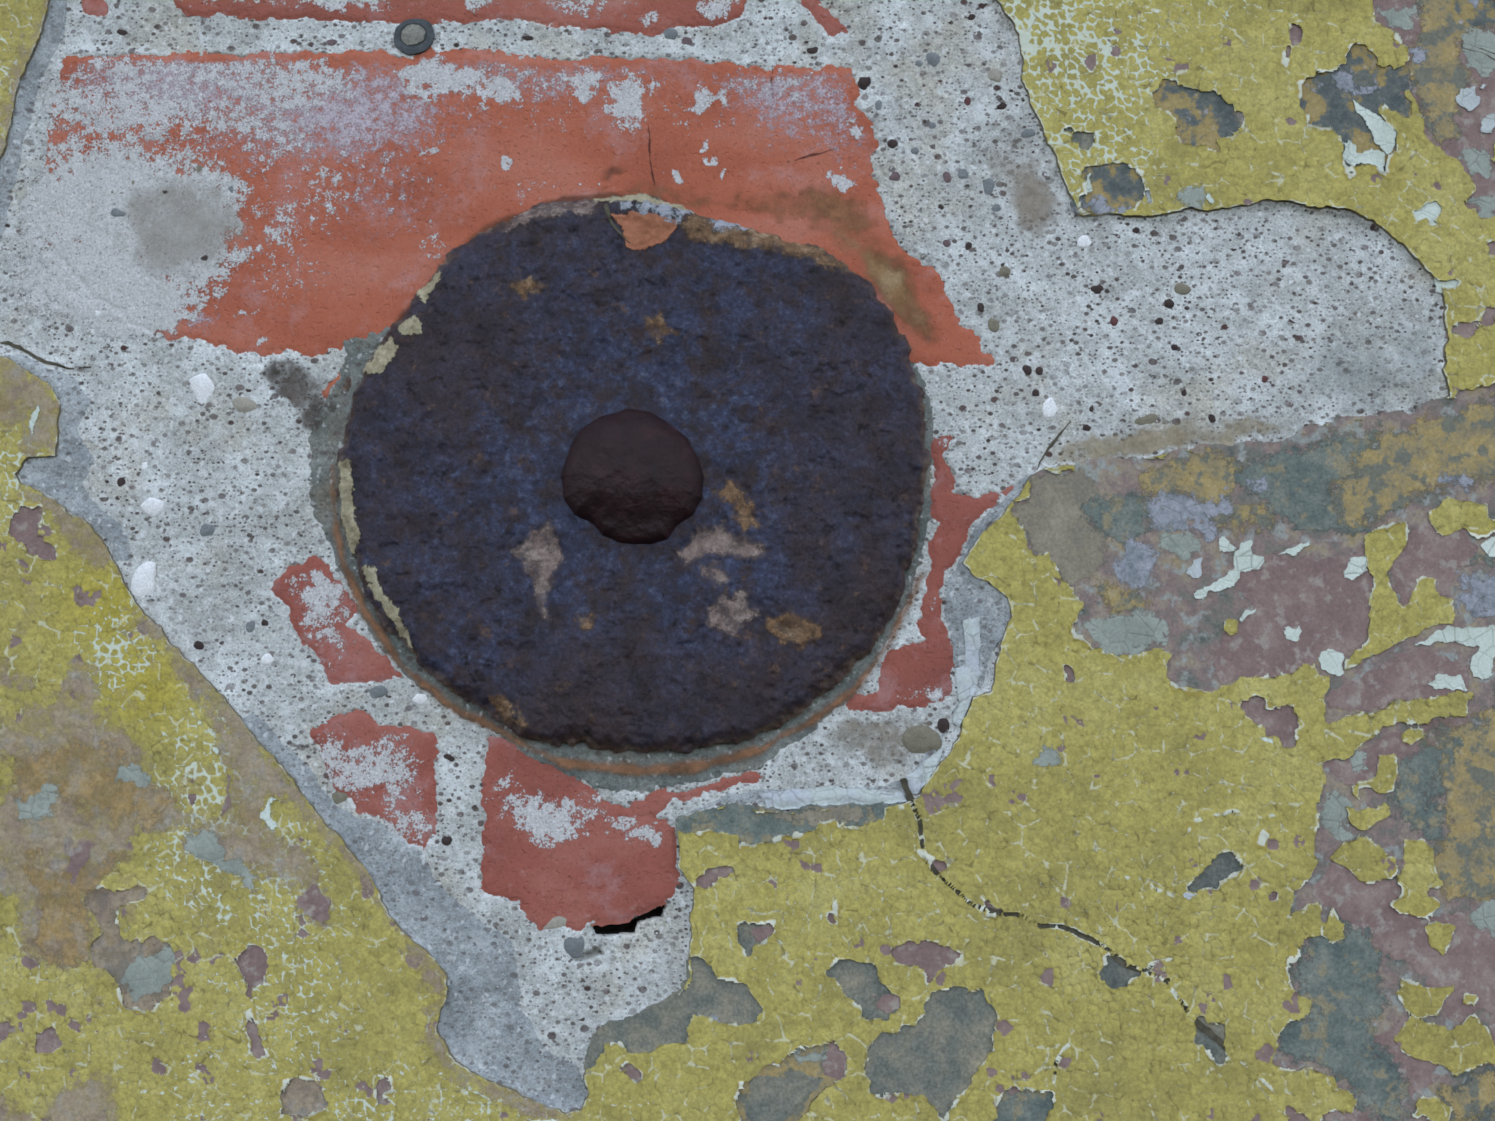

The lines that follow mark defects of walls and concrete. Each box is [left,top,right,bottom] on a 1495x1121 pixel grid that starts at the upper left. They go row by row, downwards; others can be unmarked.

corrosion [549,194,623,203]
corrosion [804,189,869,232]
corrosion [864,252,931,338]
spalling [0,0,763,1121]
corrosion [334,519,923,775]
spalling [431,0,1495,1121]
crack [900,778,1225,1050]